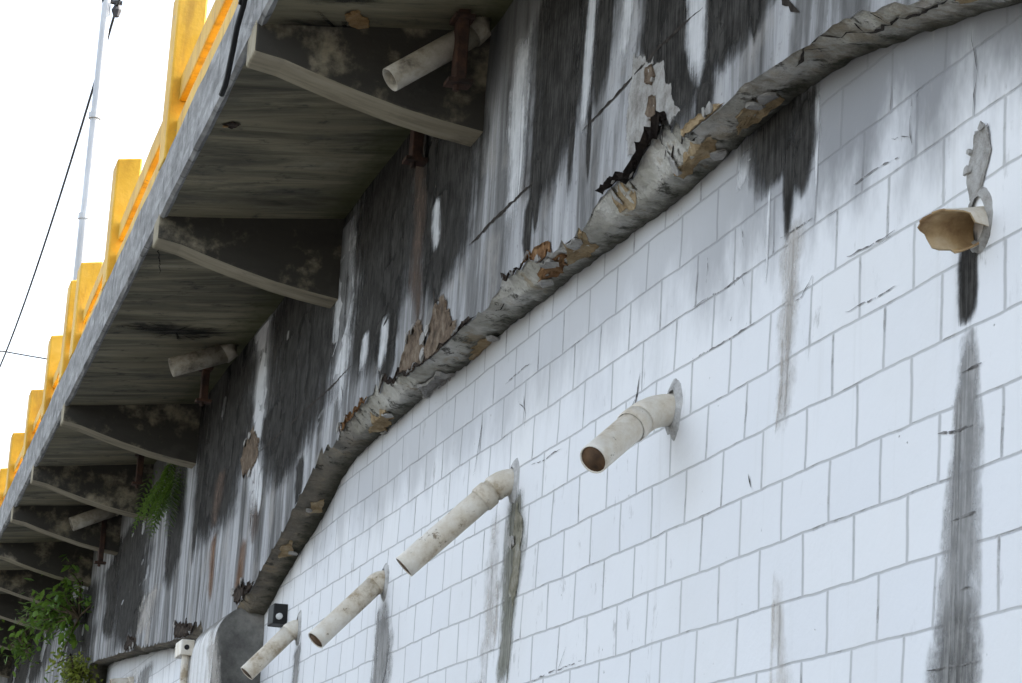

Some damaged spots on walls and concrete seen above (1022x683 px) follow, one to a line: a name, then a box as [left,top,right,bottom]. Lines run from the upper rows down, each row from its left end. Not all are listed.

crack [582,7,703,131]
peeling [595,53,680,213]
damp [508,0,775,262]
crack [661,125,697,159]
spalling [666,101,728,179]
spalling [963,121,991,201]
spalling [500,228,599,288]
damp [958,234,977,324]
spalling [378,294,475,392]
peeling [416,371,455,399]
damp [929,340,982,683]
damp [487,496,524,682]